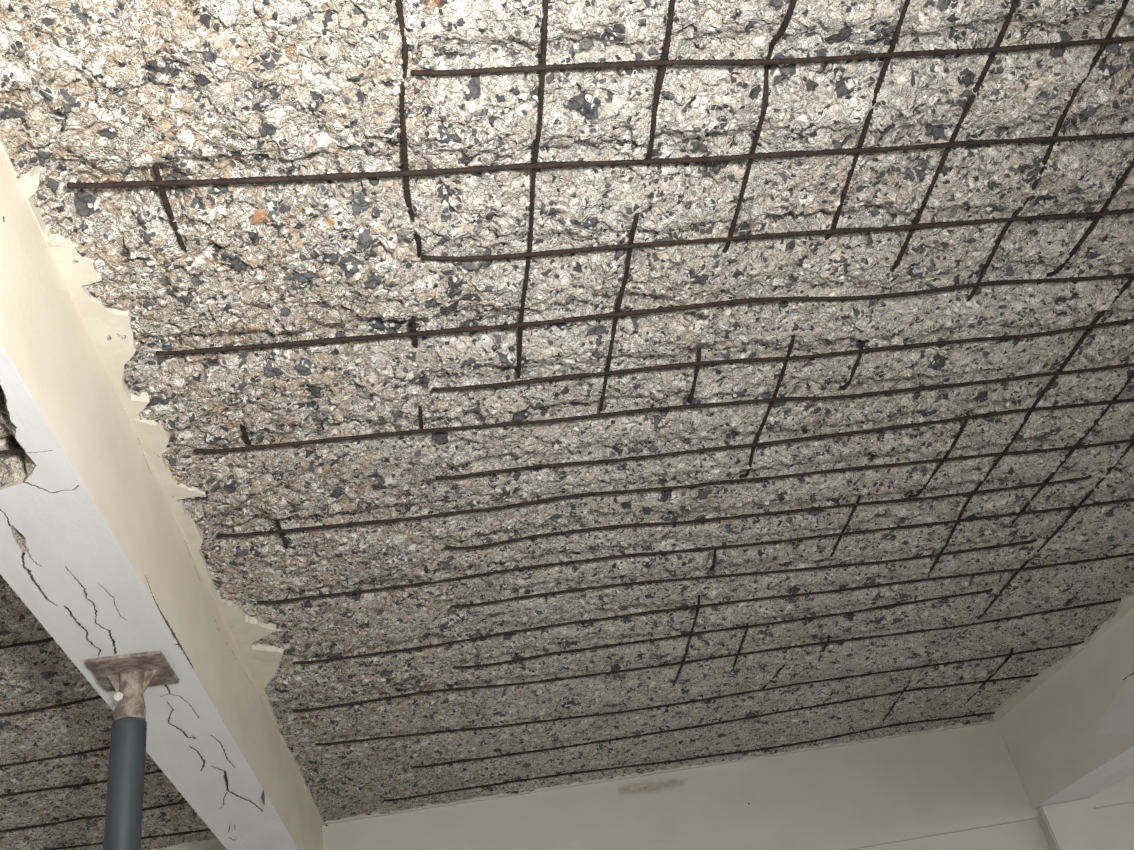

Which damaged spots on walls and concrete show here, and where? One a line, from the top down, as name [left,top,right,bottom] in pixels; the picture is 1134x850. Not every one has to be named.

spalling [411,0,1134,163]
spalling [67,132,1134,253]
spalling [421,166,1134,323]
spalling [156,273,1134,372]
crack [23,450,79,493]
crack [21,550,126,655]
flaking render [0,136,324,850]
crack [145,575,194,669]
spalling [194,360,1134,480]
spalling [257,498,1134,608]
spalling [293,552,1134,664]
crack [161,685,263,840]